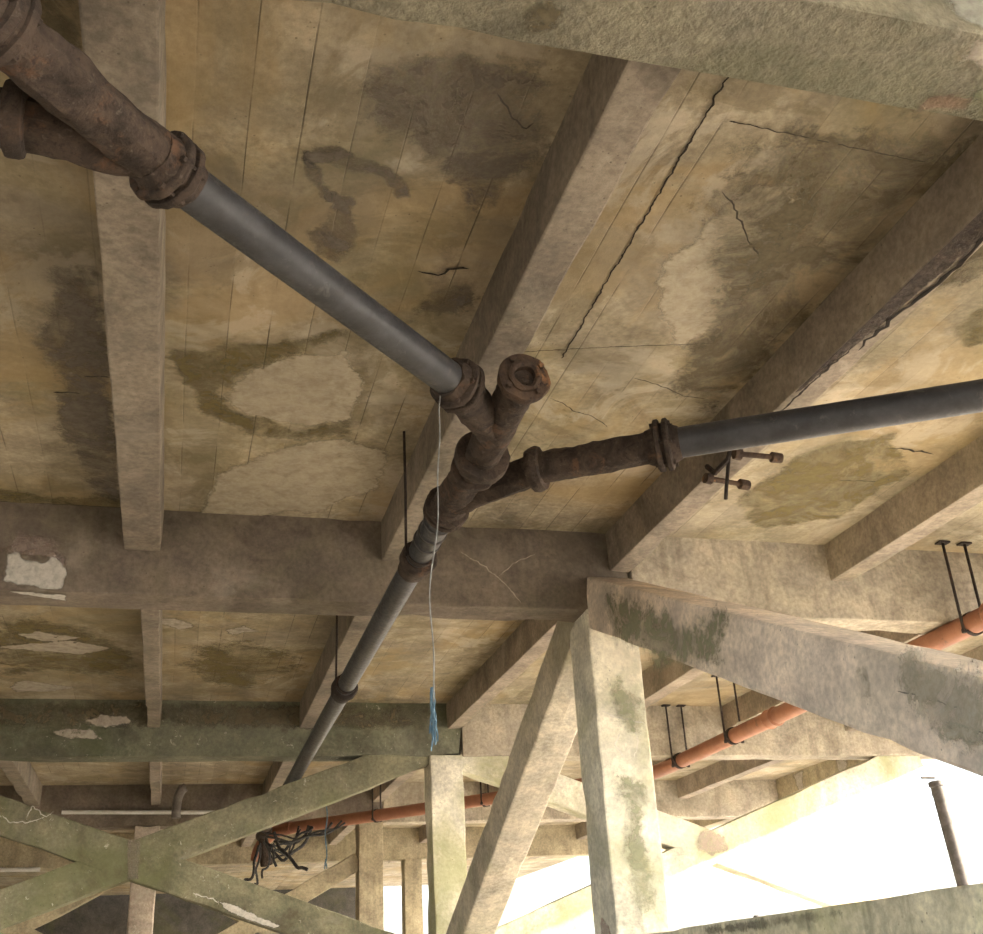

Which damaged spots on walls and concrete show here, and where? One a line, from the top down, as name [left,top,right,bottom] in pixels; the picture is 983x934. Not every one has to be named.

peeling [951,0,983,28]
peeling [964,40,983,66]
damp [365,57,545,212]
damp [303,147,410,261]
crack [527,77,807,358]
crack [418,267,468,276]
damp [965,310,983,347]
damp [39,271,120,502]
damp [745,434,908,528]
peeling [4,536,67,601]
peeling [1,631,108,654]
peeling [54,715,130,739]